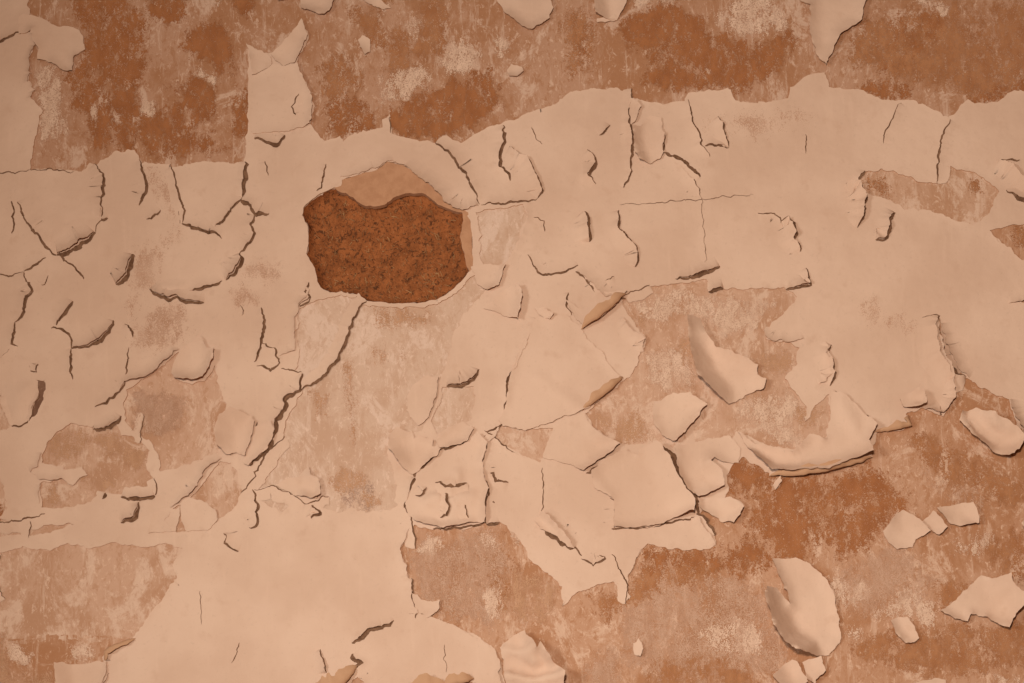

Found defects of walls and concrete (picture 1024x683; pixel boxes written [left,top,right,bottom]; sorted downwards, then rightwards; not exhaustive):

crack [96,478,158,523]
crack [0,94,303,443]
crack [224,297,367,552]
crack [296,281,311,307]
peeling [0,154,1024,683]
peeling [18,0,1024,218]
crack [394,89,812,549]
crack [574,446,716,604]
crack [846,168,895,241]
crack [916,314,966,392]
crack [936,119,959,184]
crack [994,158,1024,202]